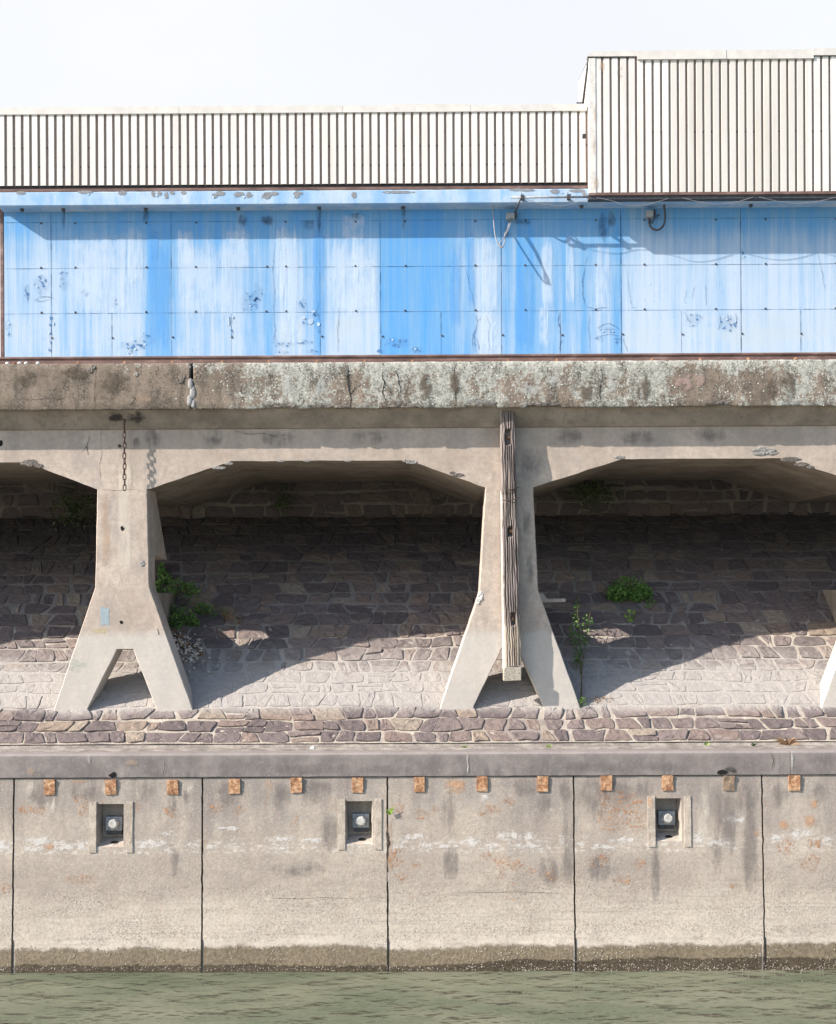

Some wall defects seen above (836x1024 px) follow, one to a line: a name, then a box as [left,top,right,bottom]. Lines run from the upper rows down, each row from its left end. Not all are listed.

peeling [212,191,278,199]
crack [345,370,401,407]
spalling [20,459,44,468]
spalling [752,446,814,469]